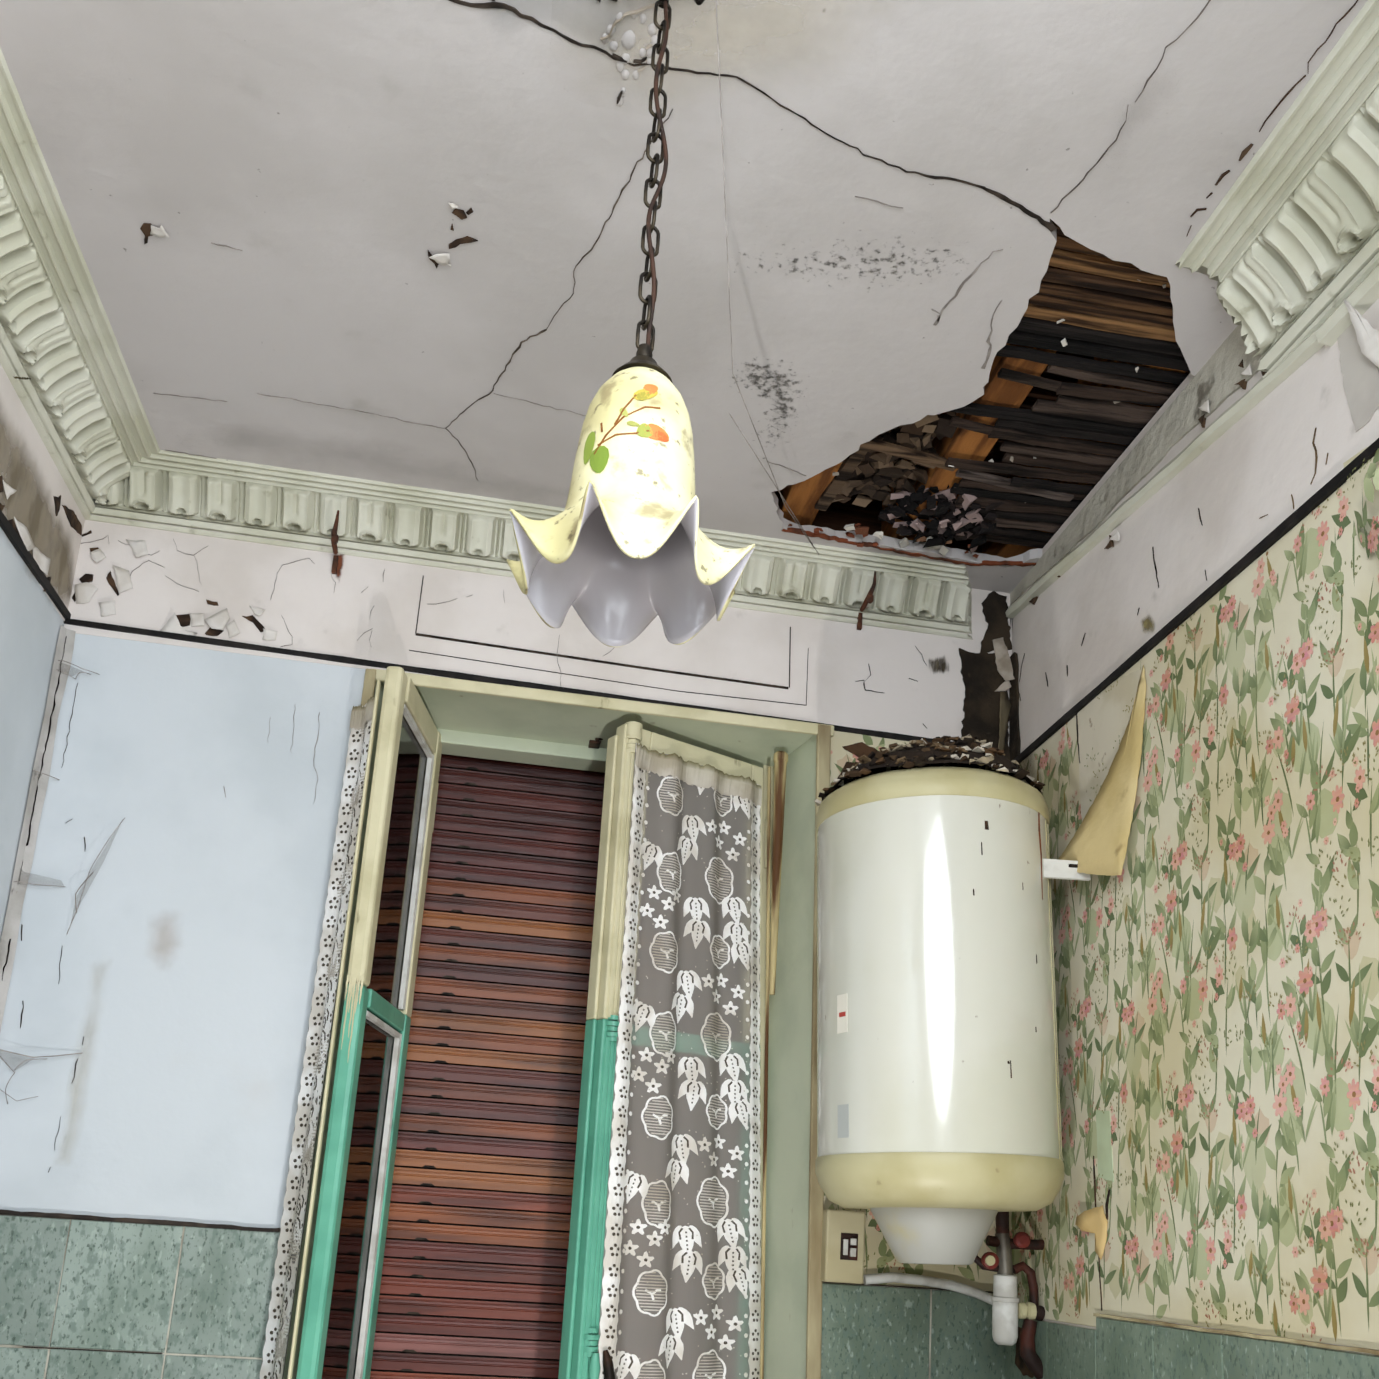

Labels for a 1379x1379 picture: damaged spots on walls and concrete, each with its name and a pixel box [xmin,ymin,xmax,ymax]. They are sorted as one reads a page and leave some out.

crack [449,0,1211,232]
crack [1186,0,1358,237]
crack [153,109,673,480]
peeling [428,203,478,269]
peeling [1234,359,1267,390]
peeling [1337,299,1379,432]
peeling [832,411,960,519]
spalling [782,528,1036,567]
peeling [160,599,278,641]
flaking render [958,591,1021,769]
crack [18,636,67,884]
crack [2,939,11,979]